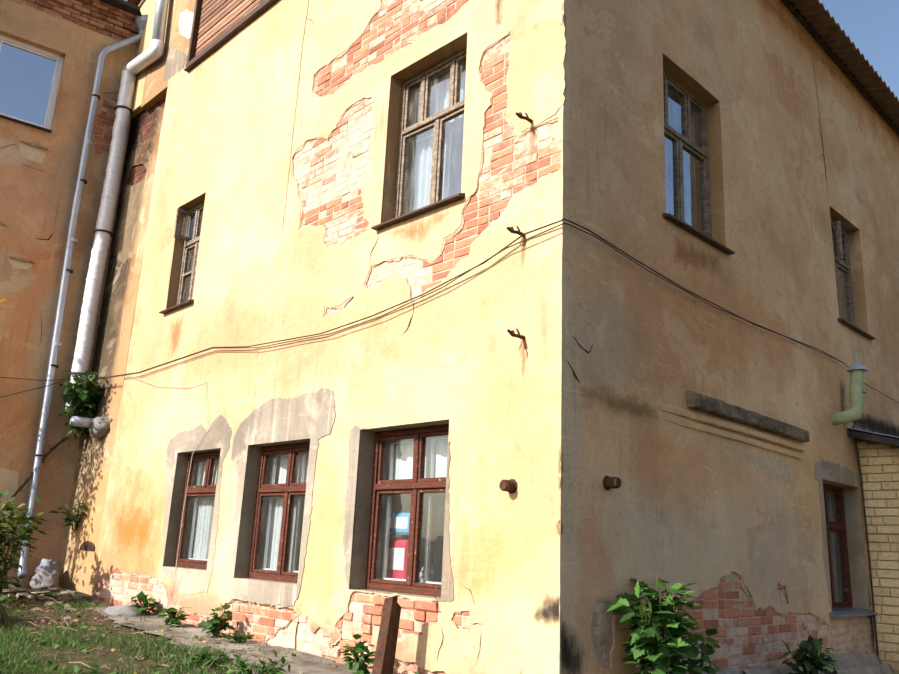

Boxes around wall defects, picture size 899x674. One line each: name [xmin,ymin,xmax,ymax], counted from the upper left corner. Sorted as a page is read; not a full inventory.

spalling [312,0,469,98]
peeling [20,140,48,163]
spalling [291,97,375,249]
spalling [364,31,561,302]
spalling [323,296,354,317]
water stain [853,415,899,437]
spalling [96,567,482,665]
water stain [536,599,580,674]
spalling [663,571,875,674]